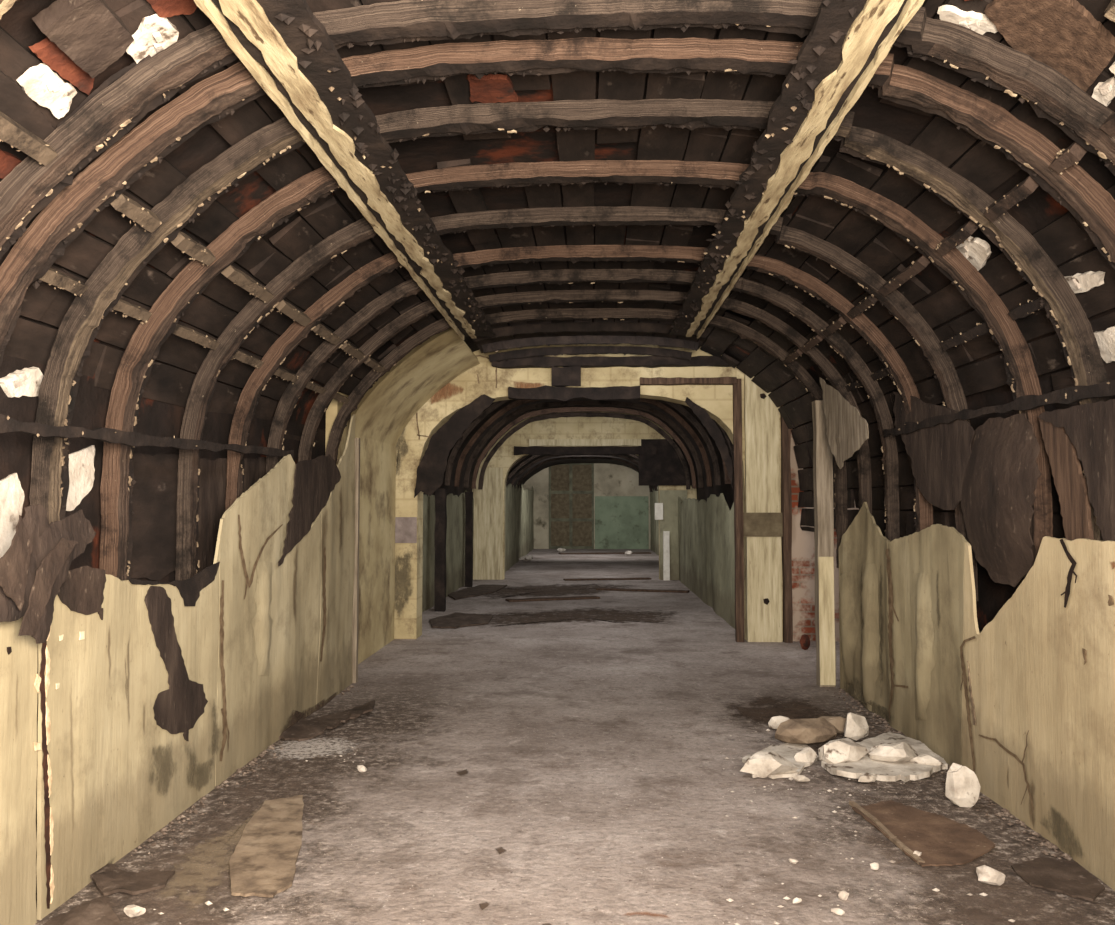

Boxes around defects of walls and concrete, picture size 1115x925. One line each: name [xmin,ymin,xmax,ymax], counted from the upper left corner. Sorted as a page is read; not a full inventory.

peeling [0,0,16,19]
peeling [17,63,77,119]
peeling [1092,61,1115,107]
flaking render [66,445,95,511]
flaking render [0,473,25,558]
spalling [57,566,106,620]
crack [1060,539,1077,608]
spalling [127,562,220,741]